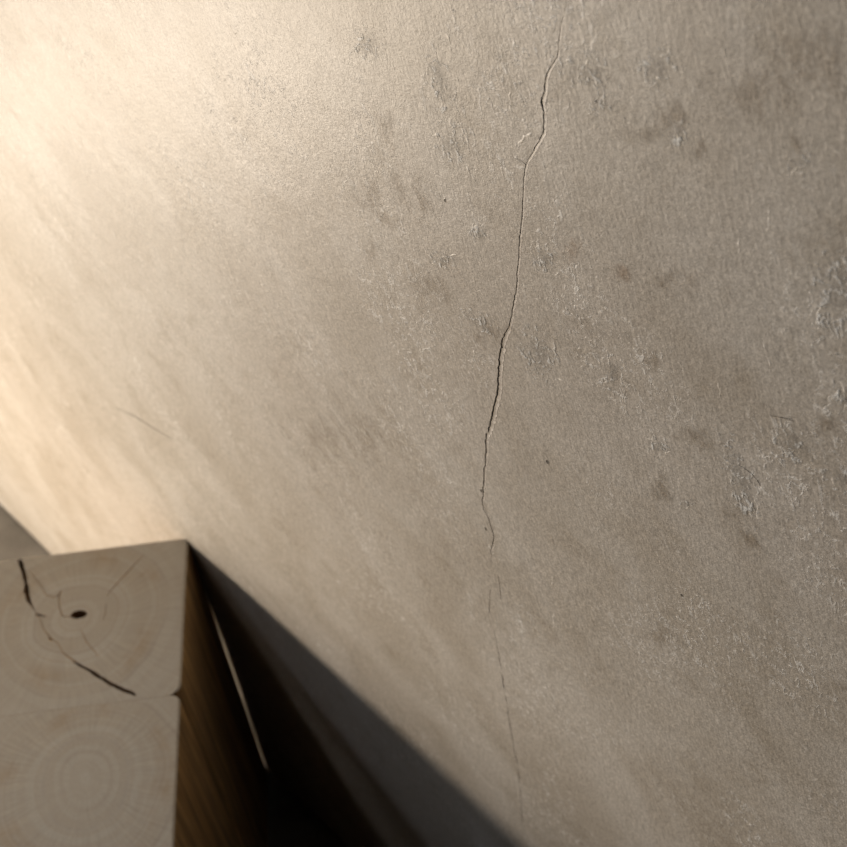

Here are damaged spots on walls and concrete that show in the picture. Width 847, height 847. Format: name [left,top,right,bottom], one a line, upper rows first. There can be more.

crack [482,0,568,604]
crack [493,629,524,837]